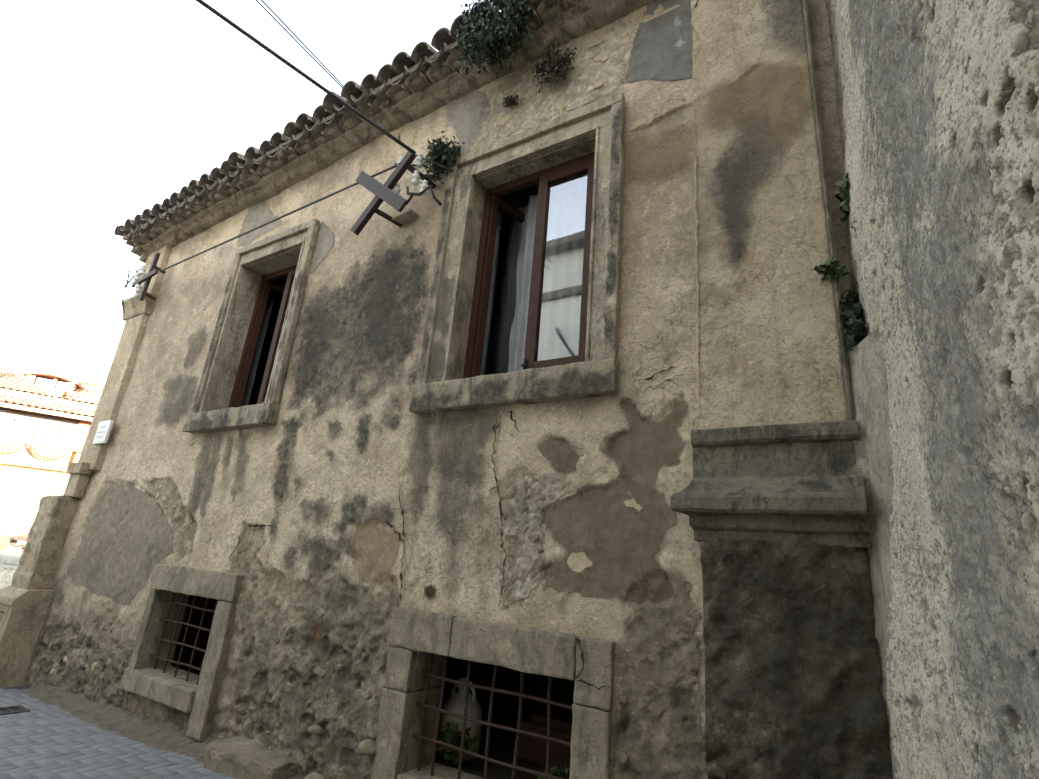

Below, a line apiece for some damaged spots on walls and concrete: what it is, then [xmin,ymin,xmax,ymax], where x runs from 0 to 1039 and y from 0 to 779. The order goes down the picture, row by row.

damp [608,106,693,235]
damp [705,63,810,260]
damp [606,249,617,295]
damp [161,275,249,515]
damp [284,494,393,569]
damp [269,223,453,540]
damp [393,379,508,536]
crack [490,408,518,607]
spalling [499,469,586,607]
peeling [567,552,593,573]
peeling [624,498,642,512]
spalling [228,517,399,779]